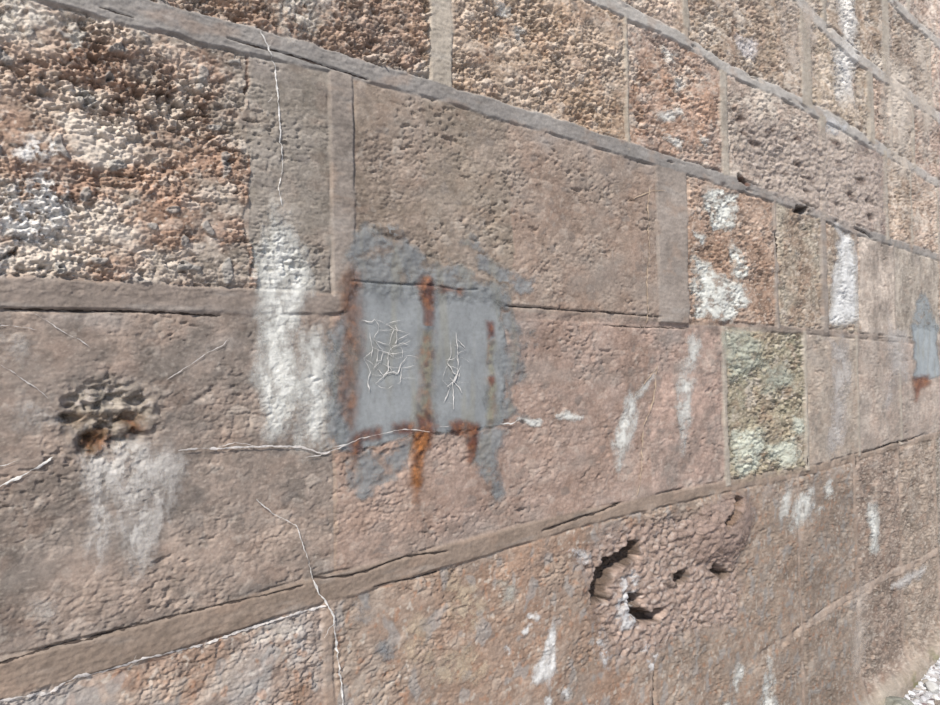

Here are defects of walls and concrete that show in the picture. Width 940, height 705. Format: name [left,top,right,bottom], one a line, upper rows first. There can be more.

crack [231,31,367,204]
efflorescence [254,222,327,440]
corrosion [420,277,461,377]
efflorescence [692,248,749,321]
efflorescence [829,233,858,324]
spalling [63,393,144,450]
crack [178,335,469,457]
corrosion [397,390,432,484]
corrosion [452,421,478,460]
efflorescence [88,441,179,556]
crack [0,500,445,705]
spalling [583,519,738,657]